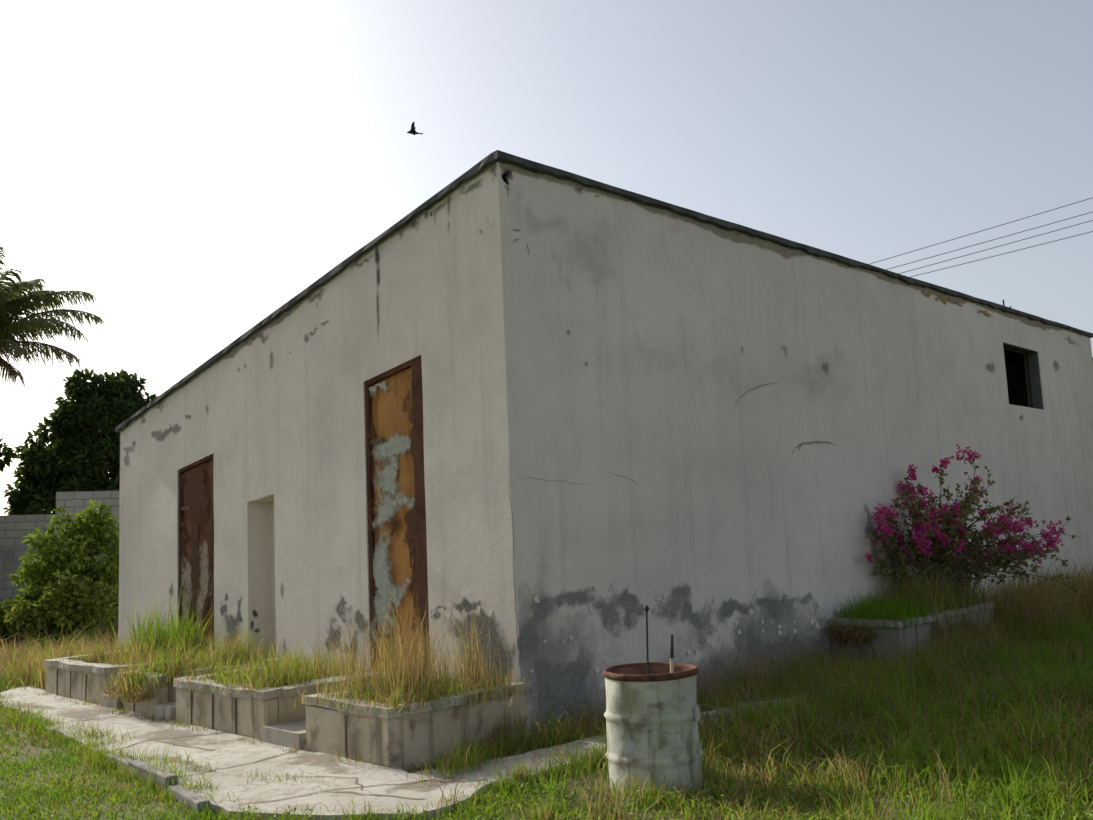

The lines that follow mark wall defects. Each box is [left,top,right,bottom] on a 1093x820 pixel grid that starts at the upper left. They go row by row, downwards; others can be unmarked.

peeling [162,277,335,401]
peeling [121,409,190,441]
corrosion [181,467,212,633]
leakage [220,594,259,646]
leakage [324,597,378,658]
peeling [372,433,415,634]
corrosion [390,505,418,632]
leakage [433,581,644,733]
leakage [656,586,830,685]